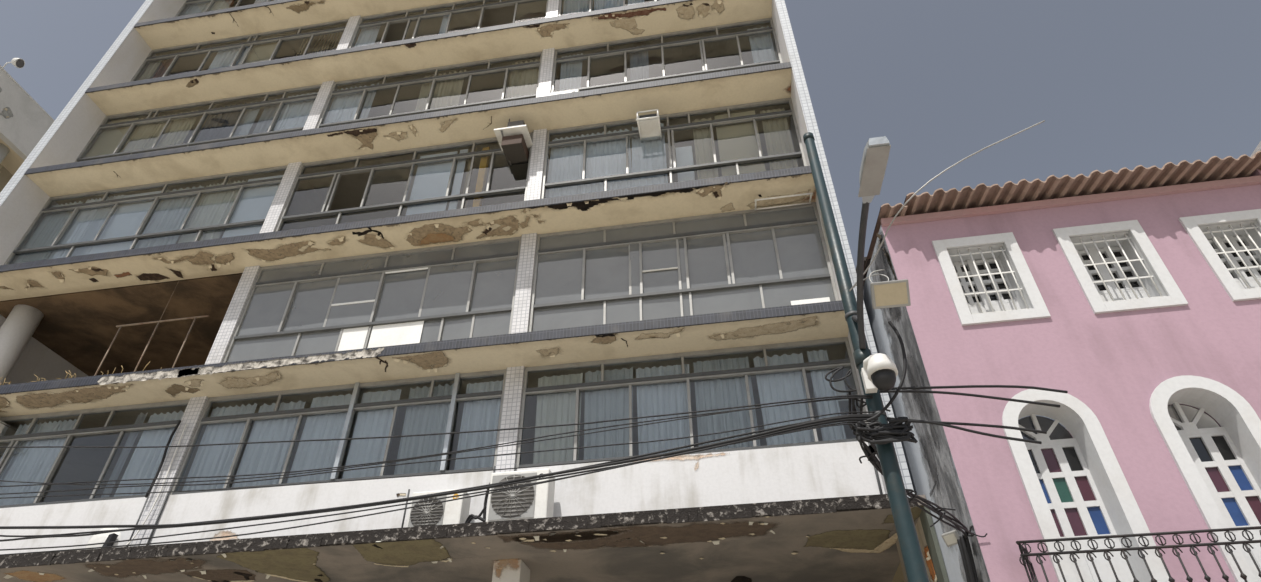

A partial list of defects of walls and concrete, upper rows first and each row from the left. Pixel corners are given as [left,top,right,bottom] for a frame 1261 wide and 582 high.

peeling [523,23,570,39]
peeling [596,0,724,35]
spalling [327,124,418,150]
peeling [52,182,732,282]
leakage [870,231,897,283]
spalling [592,334,616,344]
peeling [392,351,448,372]
peeling [0,384,133,412]
peeling [165,379,203,396]
leakage [882,306,989,582]
spalling [0,498,891,582]
leakage [804,515,898,553]